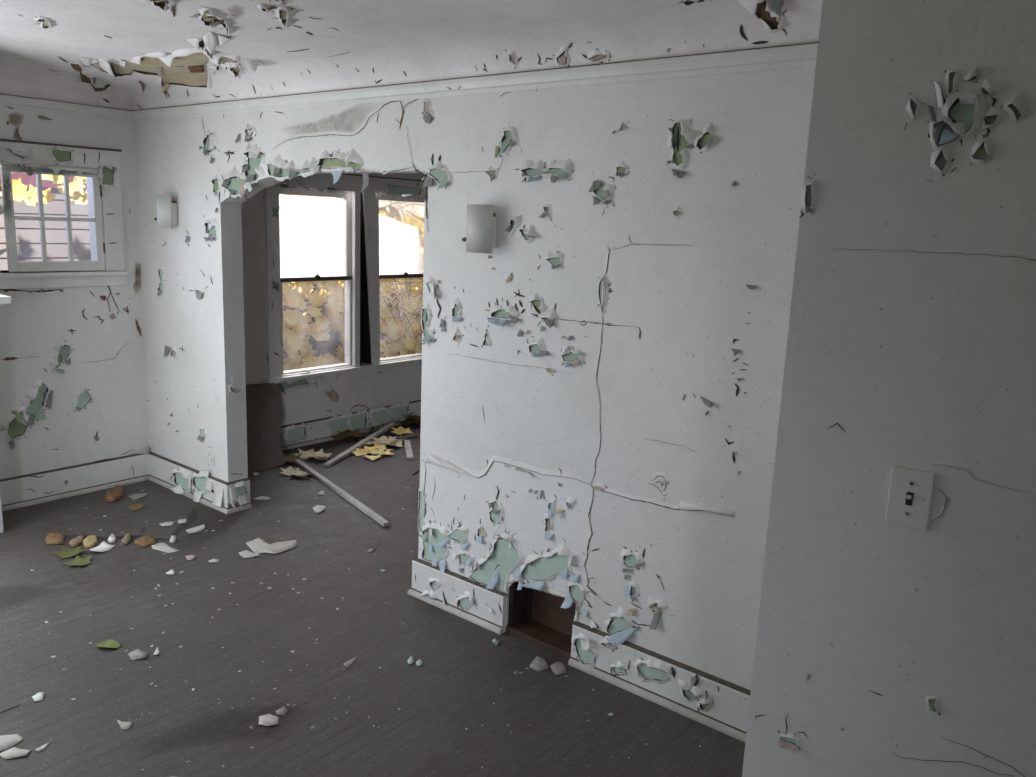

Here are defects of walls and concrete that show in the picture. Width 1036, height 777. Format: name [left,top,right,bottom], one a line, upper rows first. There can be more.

spalling [49,7,244,103]
peeling [199,113,453,247]
peeling [482,127,574,184]
peeling [666,119,717,178]
peeling [904,66,1030,182]
crack [603,235,695,275]
crack [829,245,1036,261]
peeling [421,273,586,376]
peeling [0,328,76,449]
crack [421,314,705,587]
crack [929,462,1030,522]
peeling [415,465,719,712]